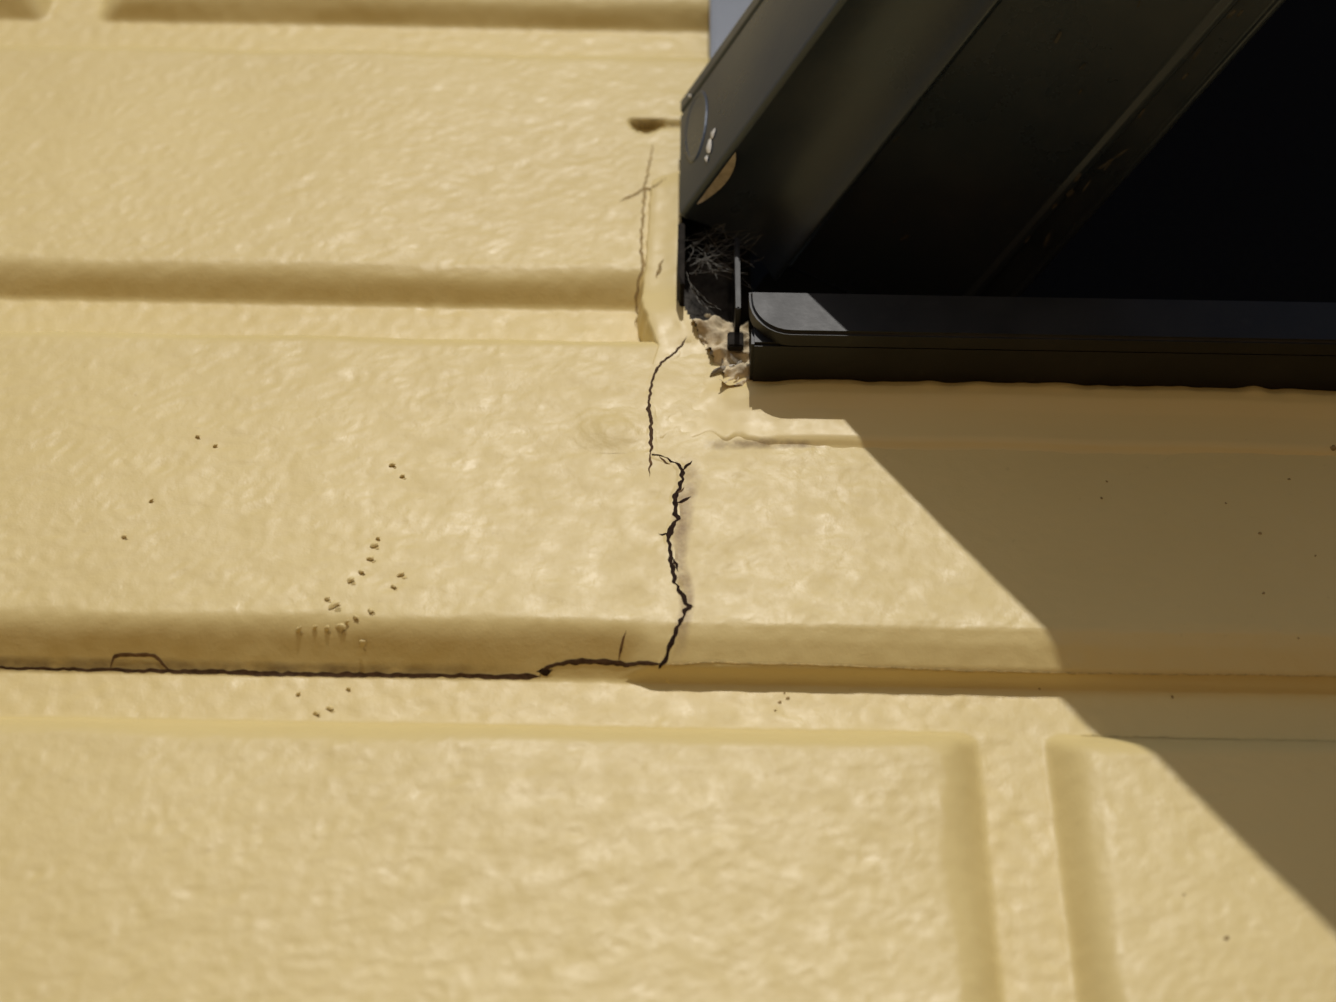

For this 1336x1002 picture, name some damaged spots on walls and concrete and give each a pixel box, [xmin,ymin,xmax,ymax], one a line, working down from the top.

crack [621,147,664,326]
crack [0,336,1336,684]